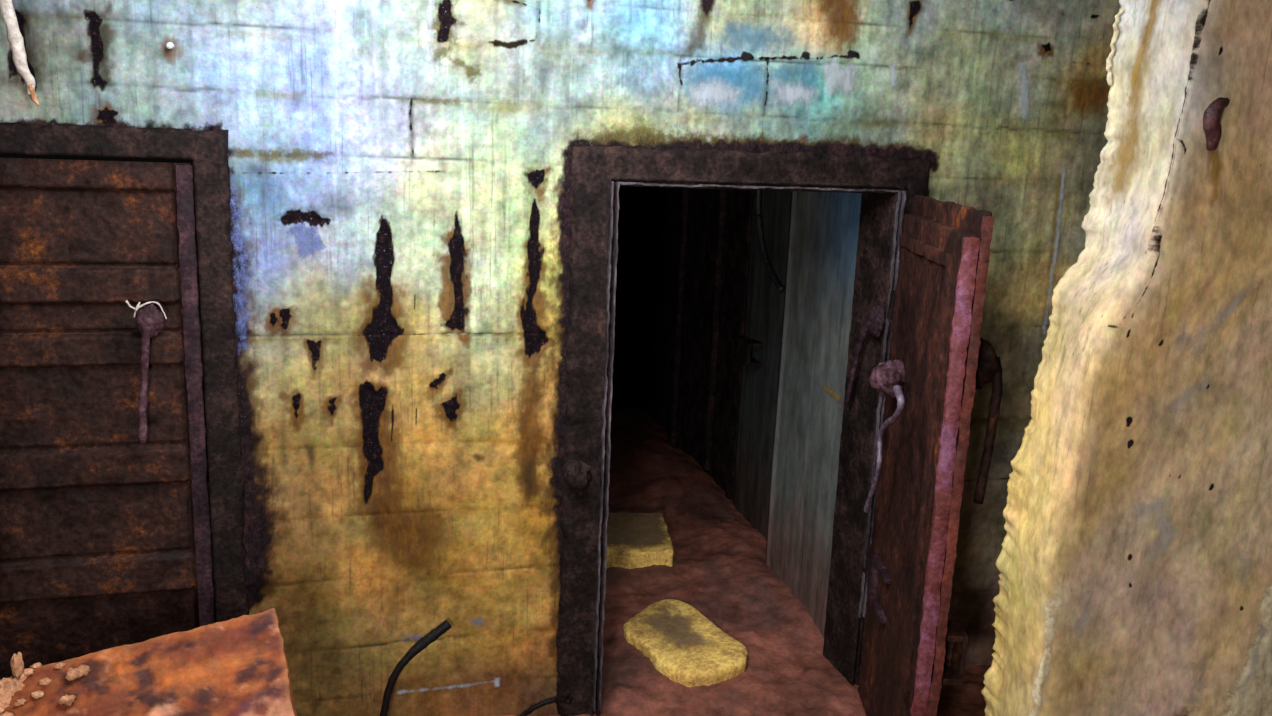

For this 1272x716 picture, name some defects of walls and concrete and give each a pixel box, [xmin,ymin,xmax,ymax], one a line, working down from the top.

spalling [78,10,118,124]
spalling [429,0,479,77]
crack [677,50,860,105]
rust [819,0,858,51]
crack [1108,0,1211,337]
spalling [280,209,331,256]
spalling [322,215,406,525]
spalling [438,211,472,344]
spalling [514,167,554,502]